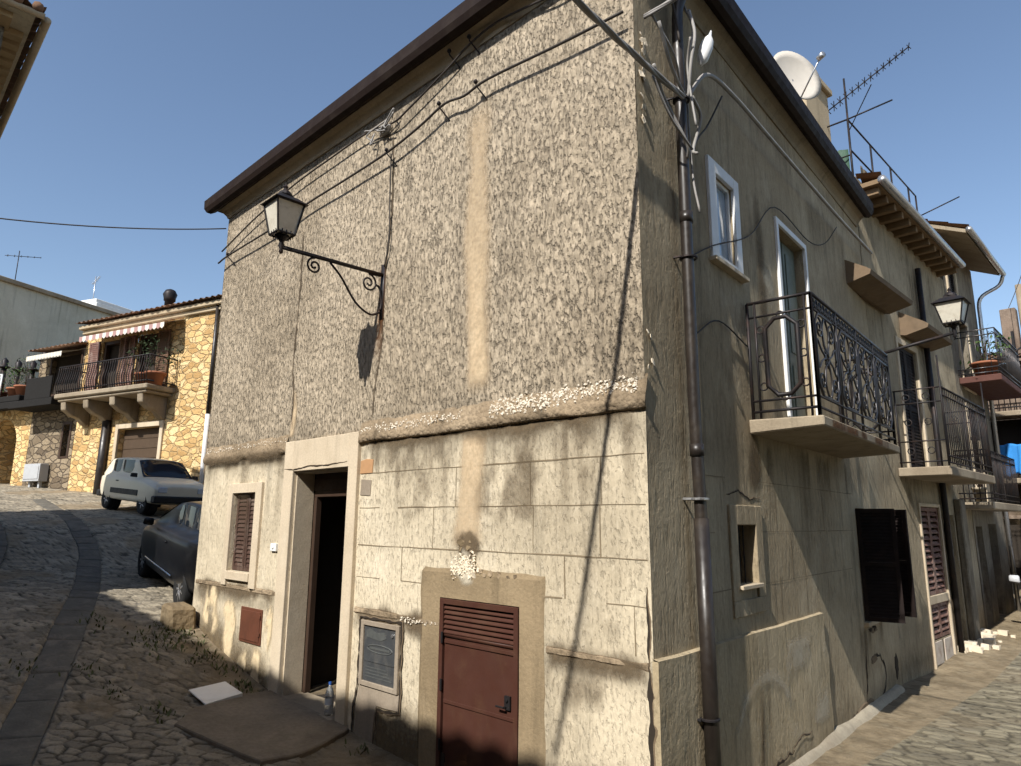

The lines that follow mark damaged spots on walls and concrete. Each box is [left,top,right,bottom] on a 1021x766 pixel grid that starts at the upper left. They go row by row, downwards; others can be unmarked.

water stain [466,123,488,383]
water stain [209,454,283,469]
water stain [370,411,623,540]
spalling [450,531,517,584]